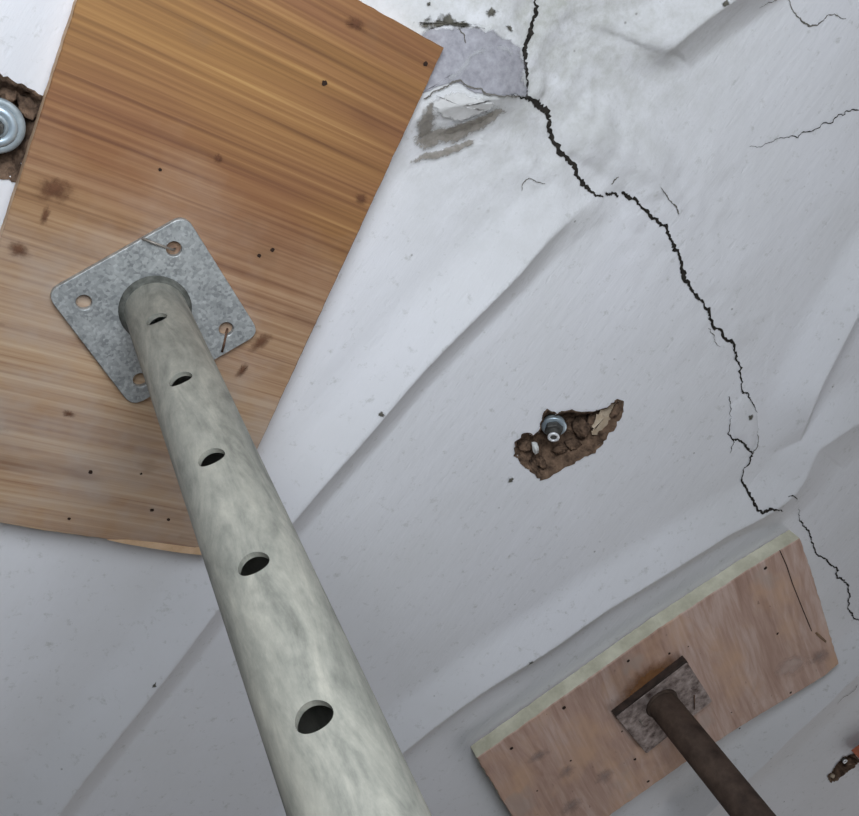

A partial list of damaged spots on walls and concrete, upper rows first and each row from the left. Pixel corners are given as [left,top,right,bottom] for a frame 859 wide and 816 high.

flaking render [421,27,527,121]
flaking render [0,74,43,182]
crack [512,0,859,631]
flaking render [514,399,624,481]
flaking render [828,754,859,783]